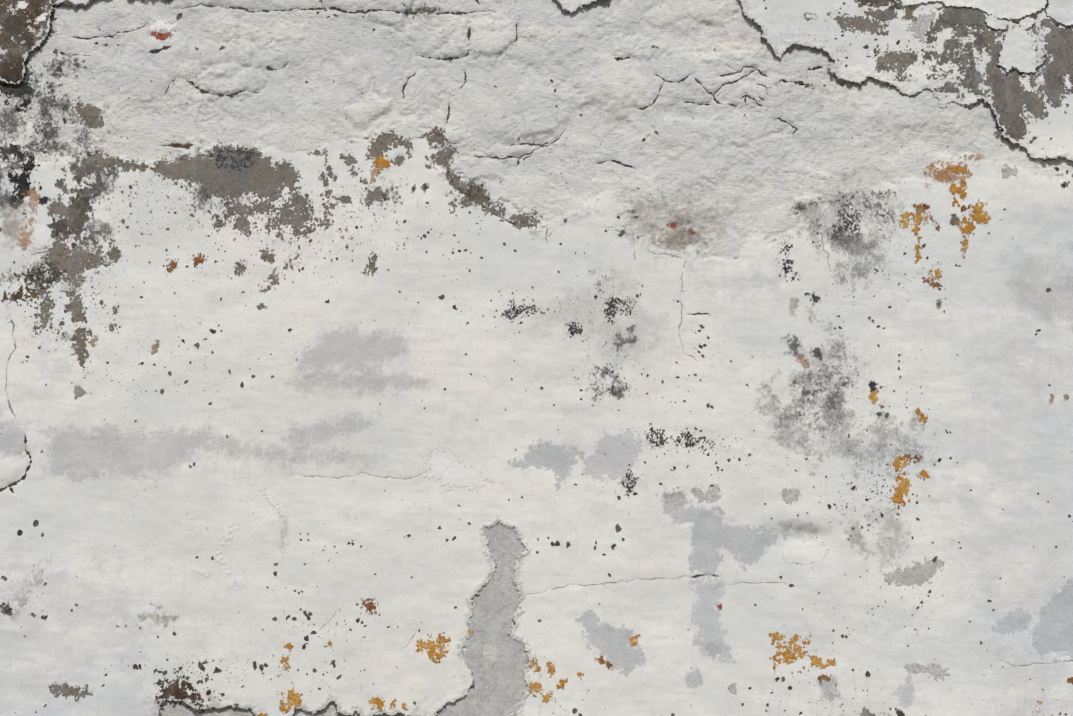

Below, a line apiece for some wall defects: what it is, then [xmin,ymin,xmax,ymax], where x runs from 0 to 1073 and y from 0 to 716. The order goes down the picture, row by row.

crack [60,24,171,56]
damp [0,53,111,218]
crack [161,0,567,244]
crack [638,66,823,135]
spalling [0,0,1073,373]
rust [899,154,991,263]
damp [502,299,543,323]
rust [889,454,930,510]
peeling [48,678,93,703]
peeling [152,517,536,716]
rust [416,633,451,663]
rust [765,631,836,683]